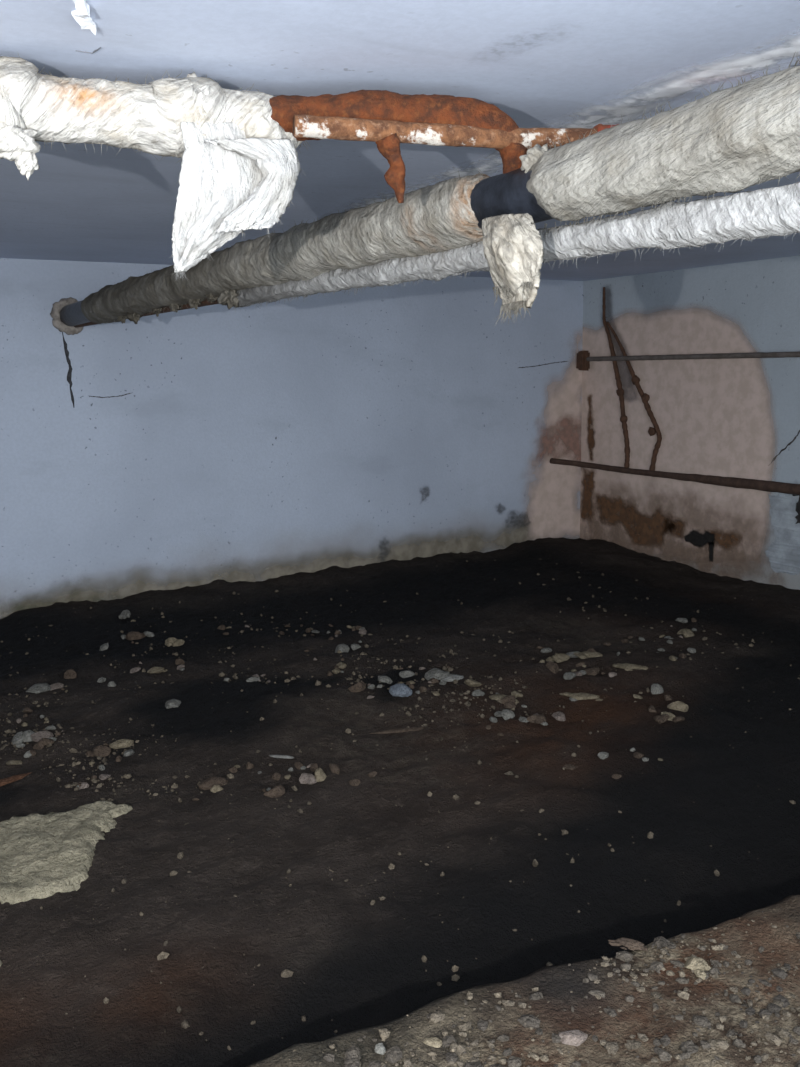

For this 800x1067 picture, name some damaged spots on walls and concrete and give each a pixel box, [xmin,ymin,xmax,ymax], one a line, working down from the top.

crack [62,332,131,408]
flaking render [498,308,800,576]
crack [768,430,800,466]
leakage [0,524,529,619]